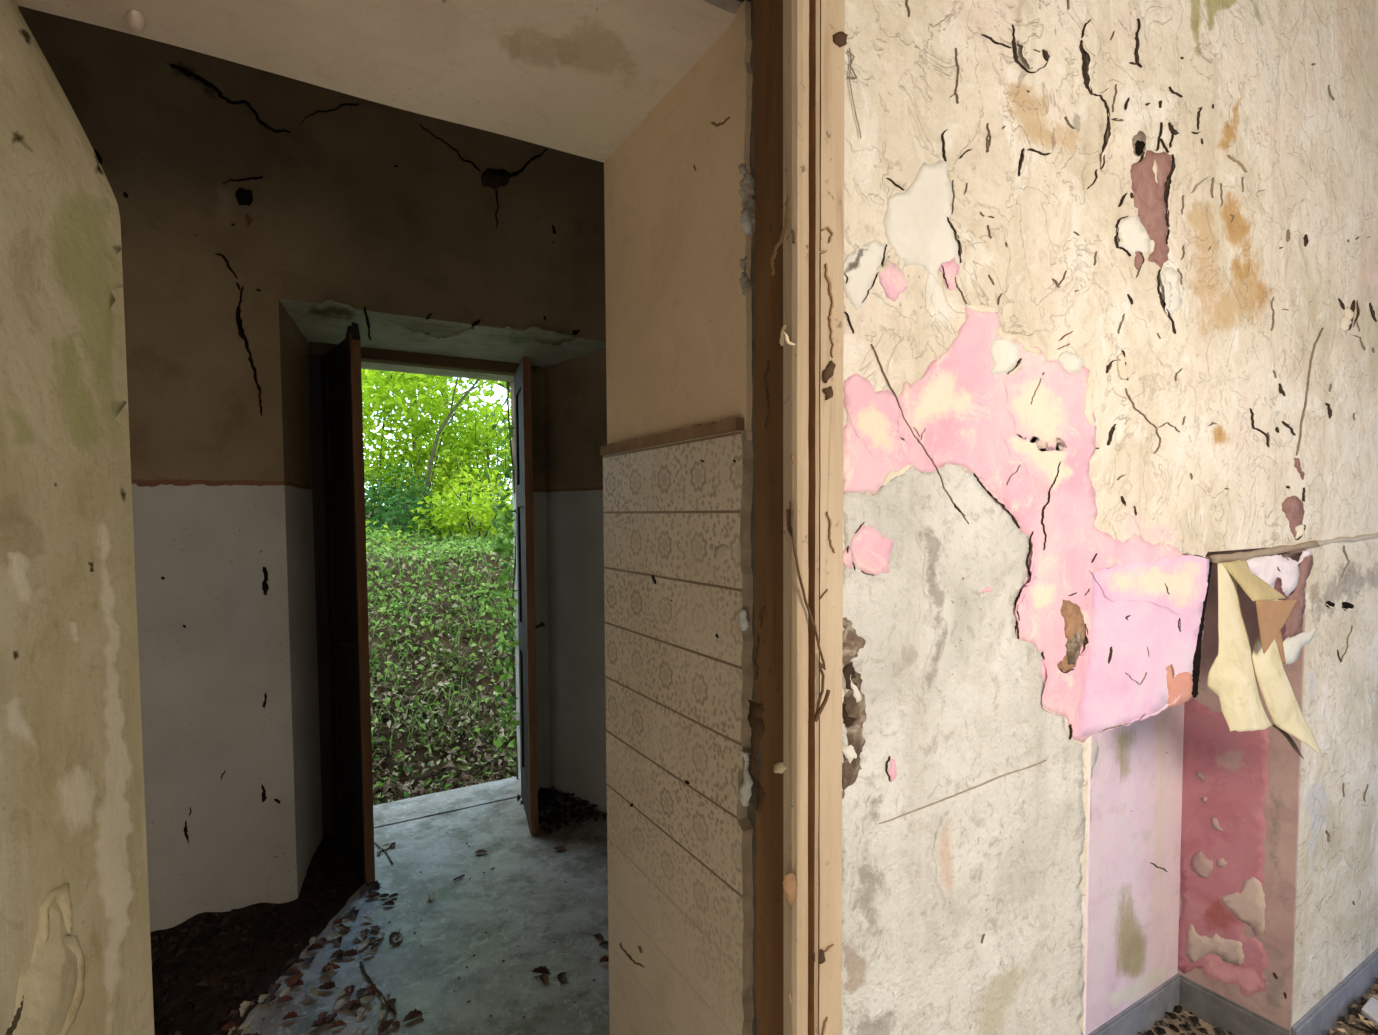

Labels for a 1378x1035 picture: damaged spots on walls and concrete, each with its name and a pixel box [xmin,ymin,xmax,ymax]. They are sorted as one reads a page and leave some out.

crack [94,149,102,165]
crack [162,59,359,133]
damp [482,9,648,102]
spalling [833,31,848,48]
damp [992,71,1085,163]
damp [1174,0,1267,78]
damp [1327,0,1378,121]
crack [1279,230,1309,249]
crack [215,253,263,417]
crack [1270,296,1289,331]
crack [1250,327,1355,456]
flaking render [812,150,1269,1035]